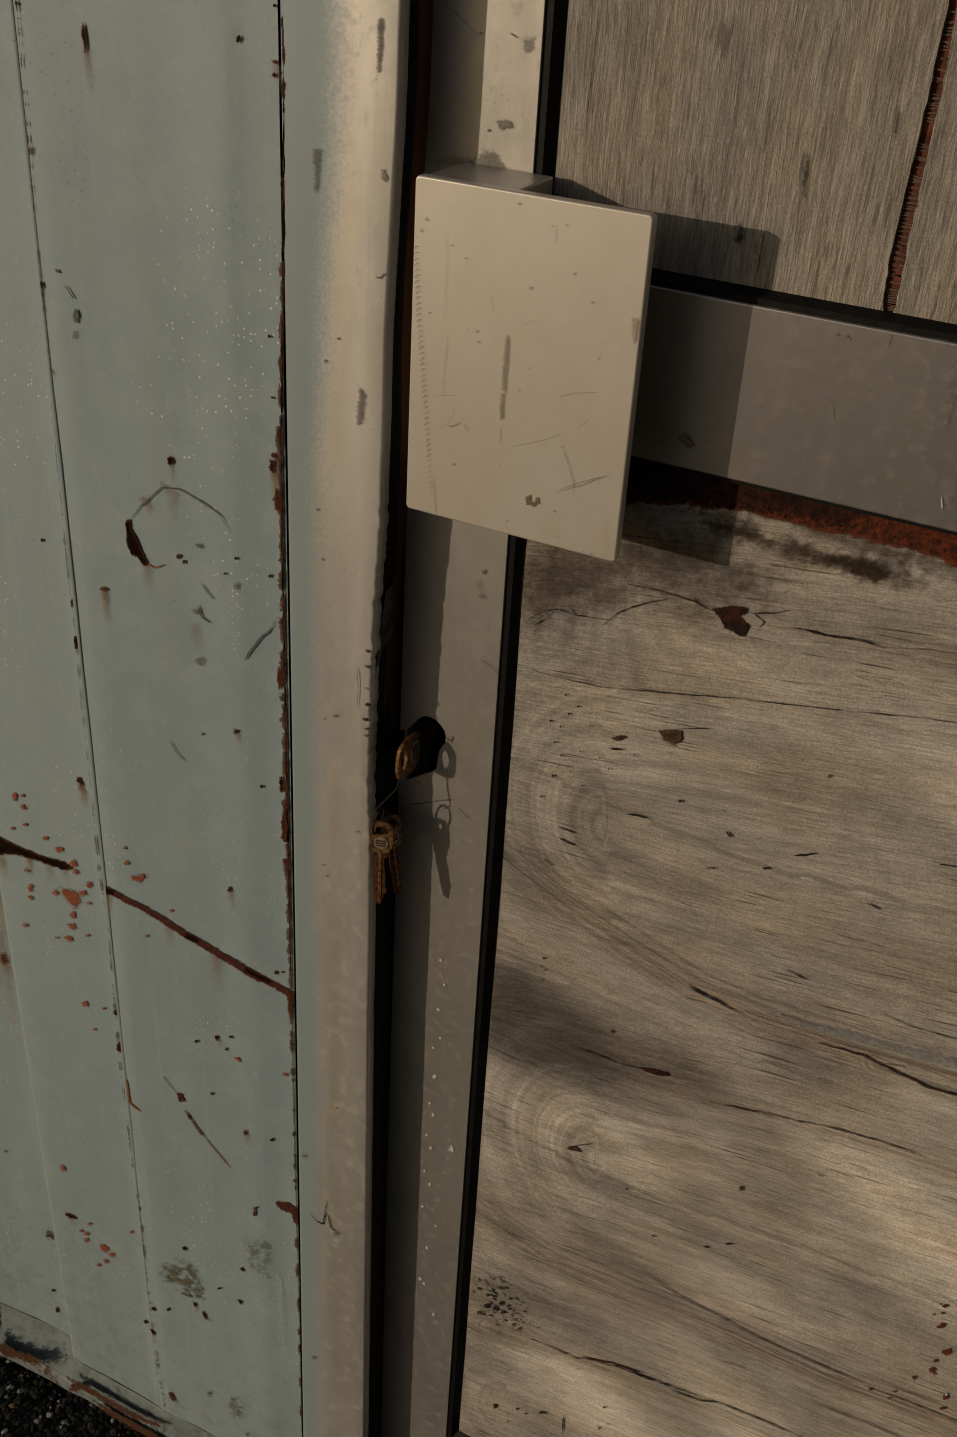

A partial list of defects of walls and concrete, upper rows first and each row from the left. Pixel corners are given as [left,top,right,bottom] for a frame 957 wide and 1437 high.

crack [884,0,957,311]
rust [63,533,84,724]
rust [94,4,303,1437]
rust [626,456,957,567]
rust [0,837,72,870]
rust [67,1195,175,1437]